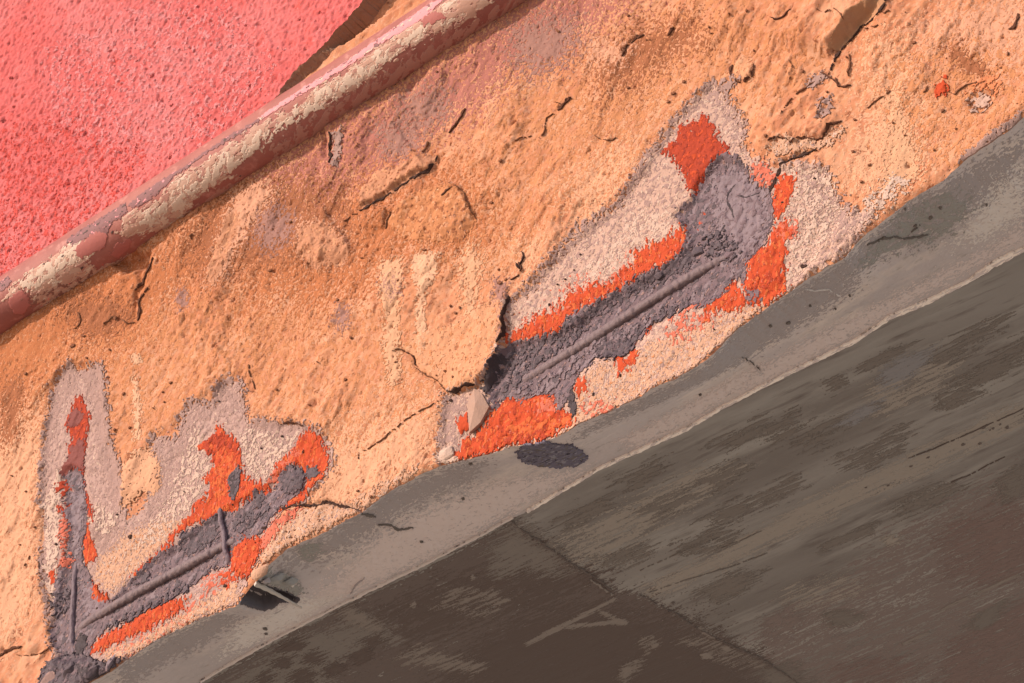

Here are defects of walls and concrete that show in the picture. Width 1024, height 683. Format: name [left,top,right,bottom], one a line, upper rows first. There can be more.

crack [767,0,889,143]
crack [344,108,476,229]
spalling [431,69,988,468]
crack [357,348,475,459]
spalling [24,334,420,683]
crack [278,500,414,531]